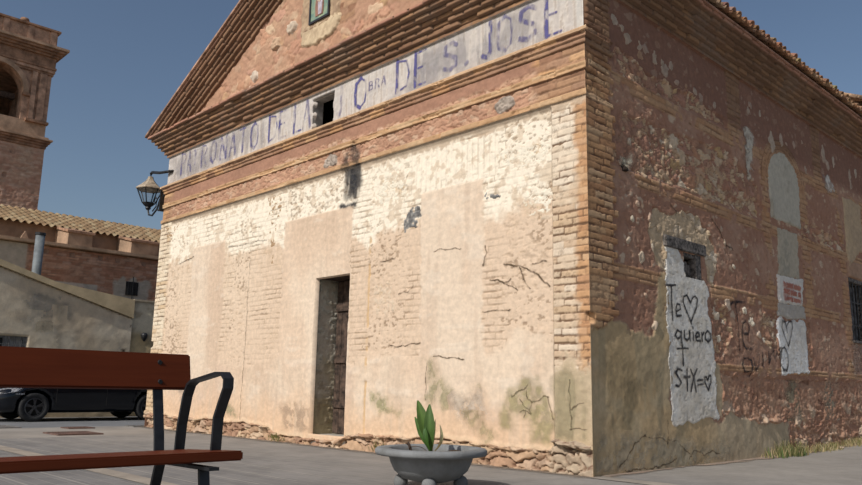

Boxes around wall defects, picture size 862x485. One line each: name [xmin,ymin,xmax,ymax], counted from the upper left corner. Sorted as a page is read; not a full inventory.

spalling [613,109,758,218]
spalling [404,206,422,233]
peeling [523,188,553,220]
spalling [638,208,726,286]
spalling [710,298,862,449]
crack [619,433,719,473]